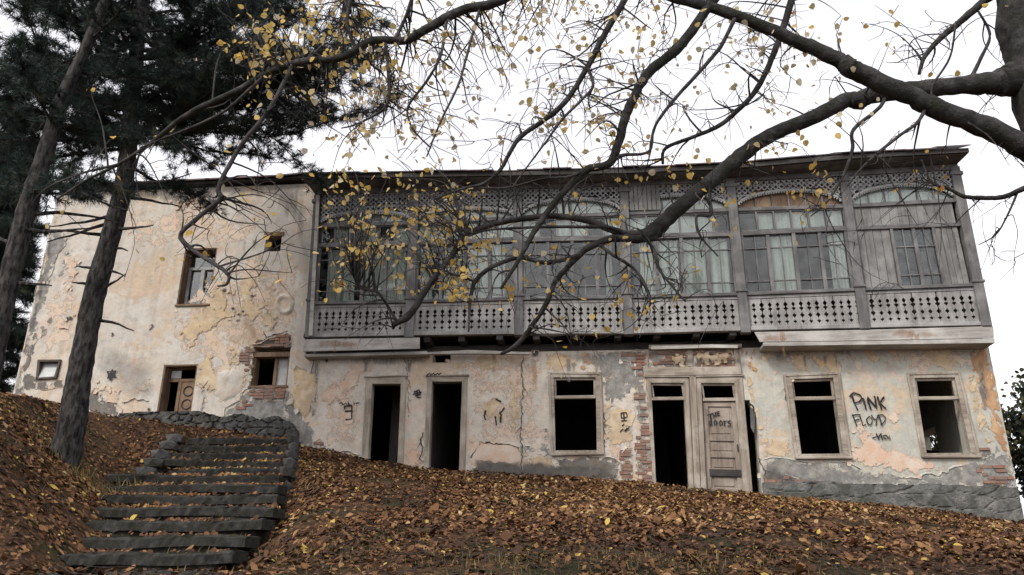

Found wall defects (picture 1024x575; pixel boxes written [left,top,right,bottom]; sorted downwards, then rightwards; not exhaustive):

spalling [15,232,81,395]
peeling [167,255,372,450]
crack [470,355,528,469]
spalling [444,349,1017,487]